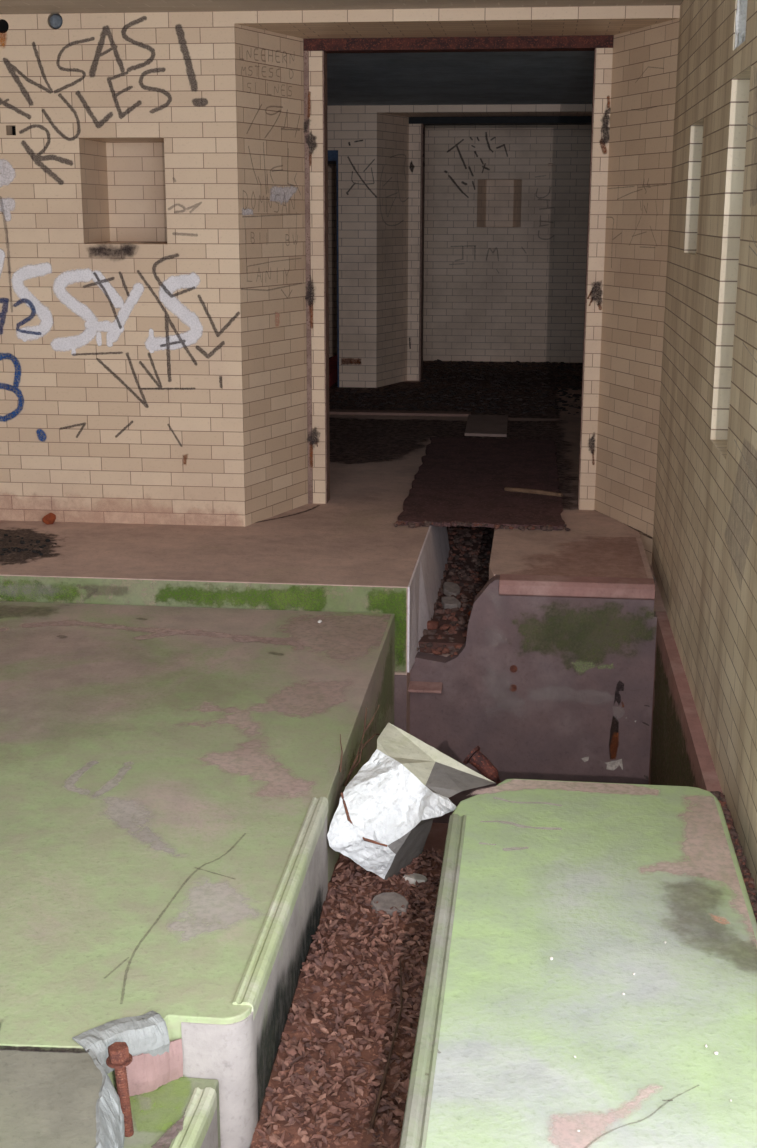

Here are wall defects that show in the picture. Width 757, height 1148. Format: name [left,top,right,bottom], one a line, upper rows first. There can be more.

spalling [72,1011,185,1148]